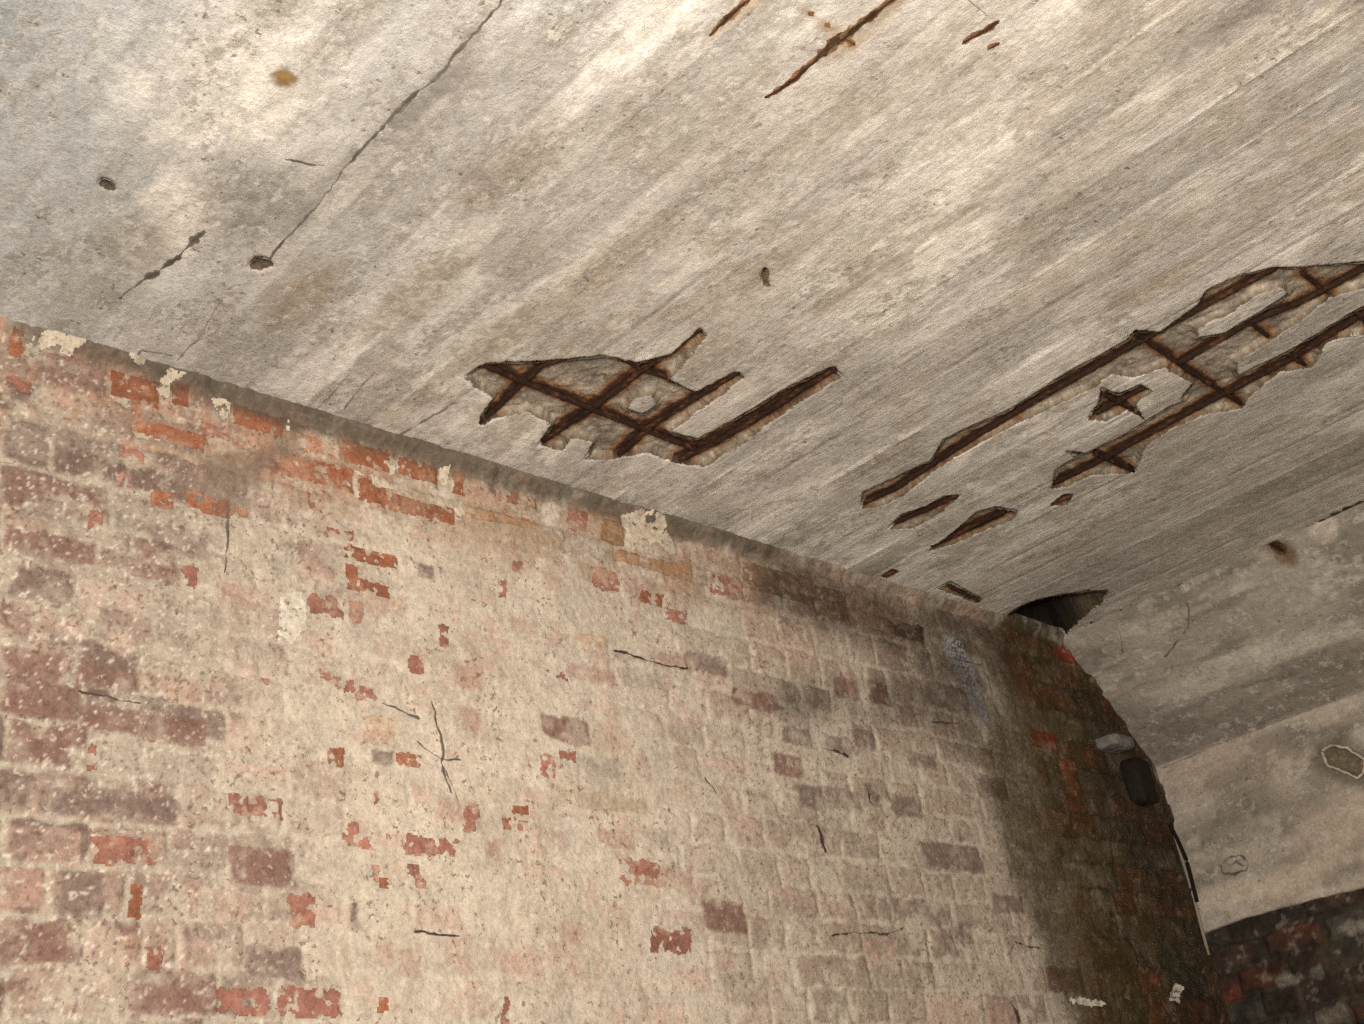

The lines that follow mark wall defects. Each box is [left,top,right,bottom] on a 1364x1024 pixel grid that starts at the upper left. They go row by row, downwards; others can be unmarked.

crack [269,0,502,259]
crack [119,230,206,299]
spalling [465,328,841,467]
spalling [861,261,1364,509]
spalling [891,494,959,529]
crack [383,700,461,800]
spalling [1321,744,1364,779]